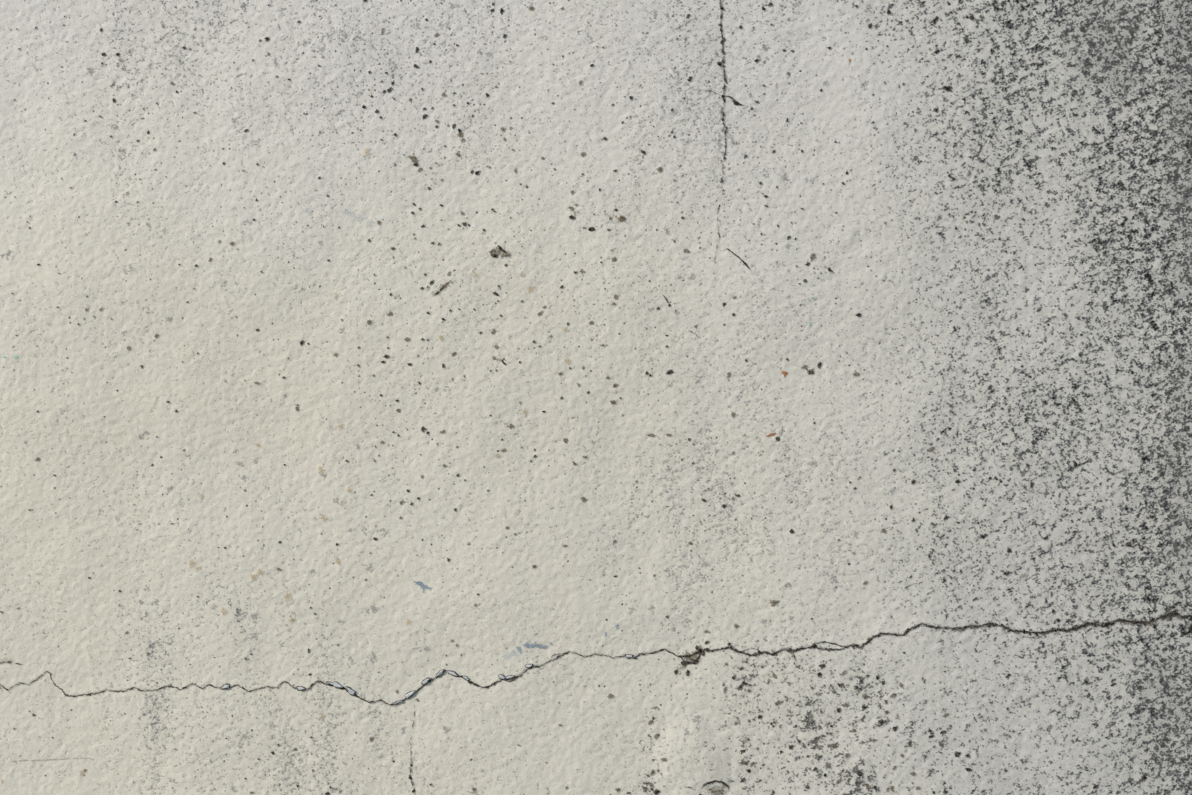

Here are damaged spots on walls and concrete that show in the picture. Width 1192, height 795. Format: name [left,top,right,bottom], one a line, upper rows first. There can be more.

crack [706,0,742,260]
crack [0,612,1192,793]